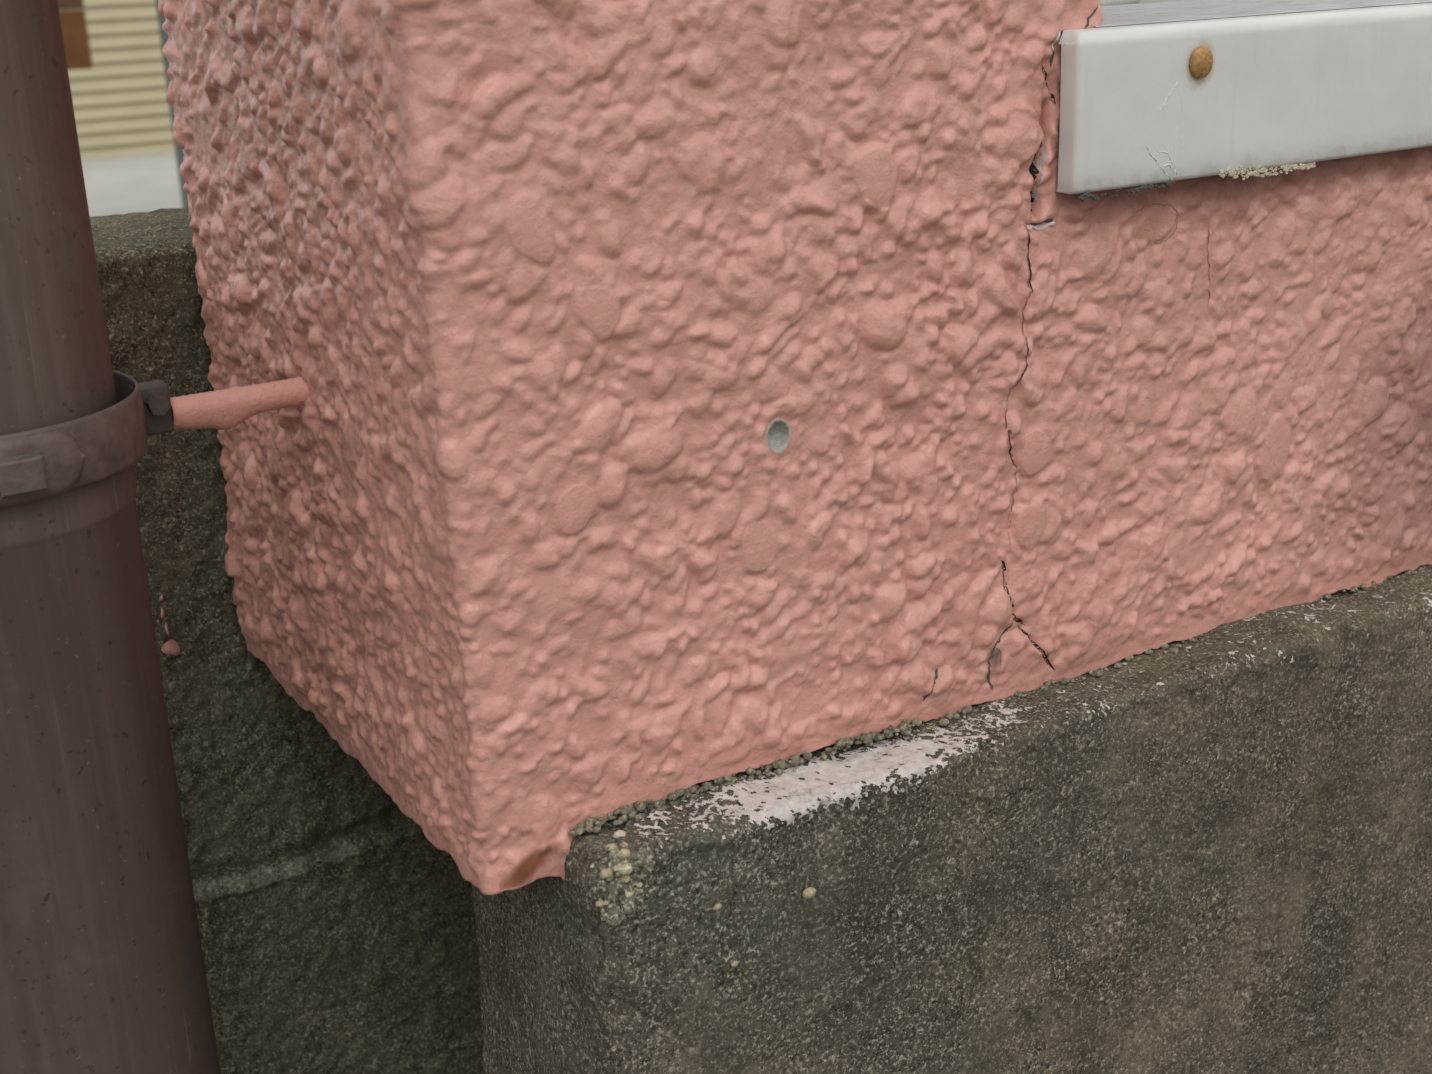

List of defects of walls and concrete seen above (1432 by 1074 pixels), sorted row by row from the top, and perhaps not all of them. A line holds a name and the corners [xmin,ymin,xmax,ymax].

crack [1042,6,1098,104]
crack [986,143,1056,690]